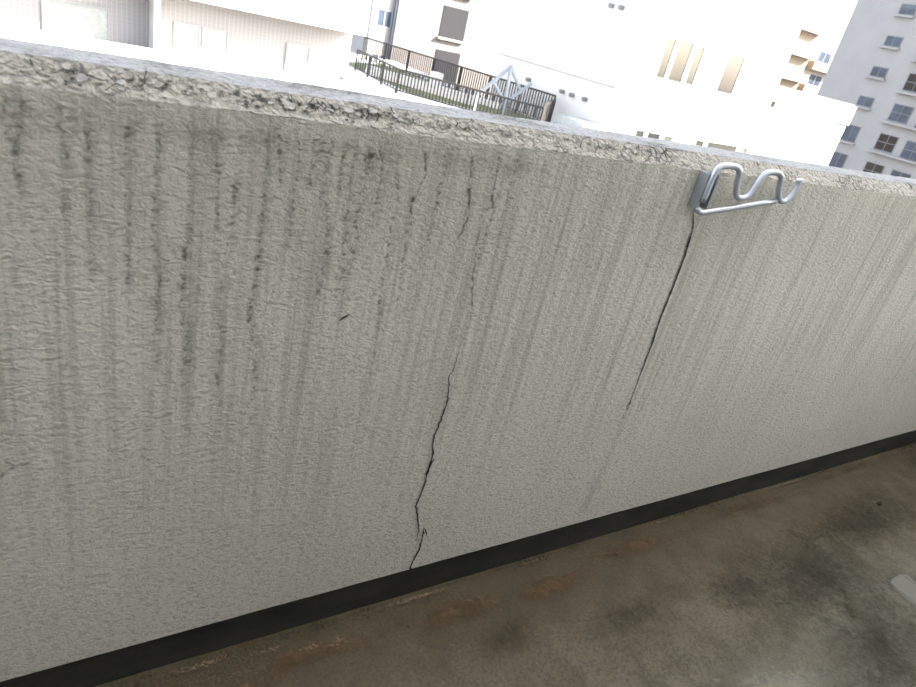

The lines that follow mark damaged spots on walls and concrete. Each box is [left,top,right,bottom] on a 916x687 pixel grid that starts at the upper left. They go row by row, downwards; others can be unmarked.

crack [457,189,494,238]
crack [627,210,694,410]
crack [409,354,459,570]